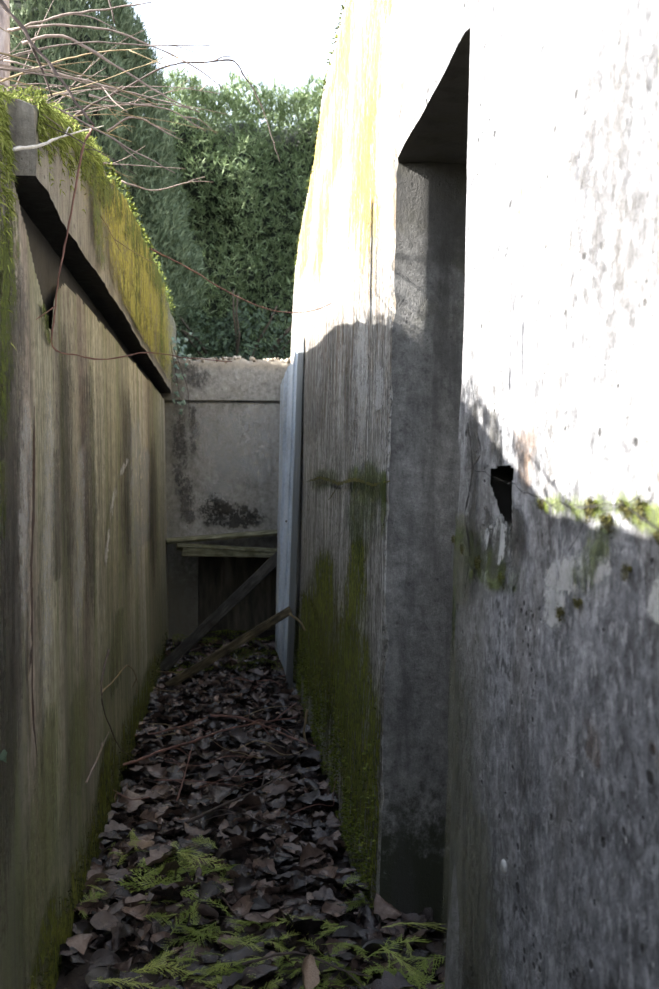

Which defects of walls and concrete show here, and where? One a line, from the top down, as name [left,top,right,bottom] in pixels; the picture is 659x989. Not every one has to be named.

water stain [184,364,211,387]
water stain [356,320,383,445]
water stain [172,406,262,529]
water stain [0,268,27,896]
water stain [294,461,387,916]